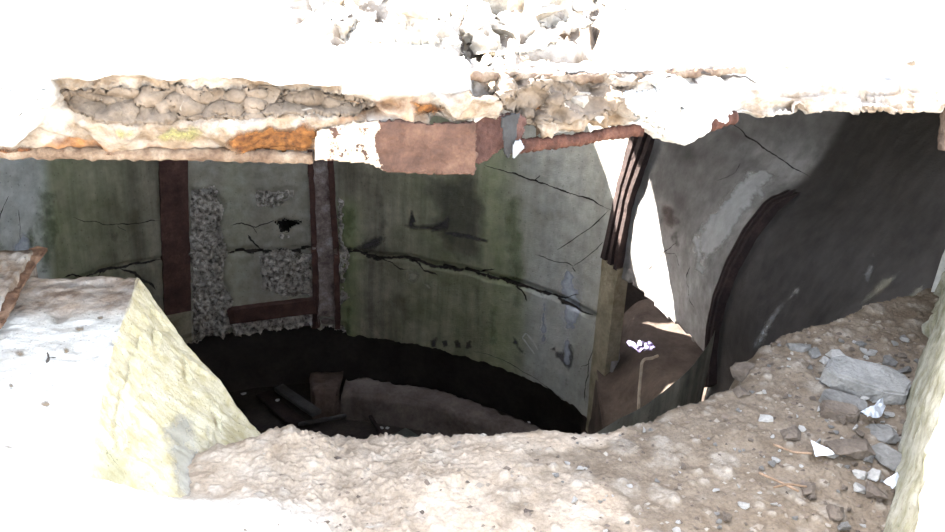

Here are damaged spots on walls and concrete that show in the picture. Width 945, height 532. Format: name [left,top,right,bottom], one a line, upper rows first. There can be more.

spalling [290,0,626,66]
spalling [60,82,376,126]
spalling [484,74,631,136]
corrosion [227,124,319,155]
crack [734,125,807,175]
crack [65,259,161,290]
spalling [186,185,346,345]
water stain [408,179,488,253]
crack [348,166,611,315]